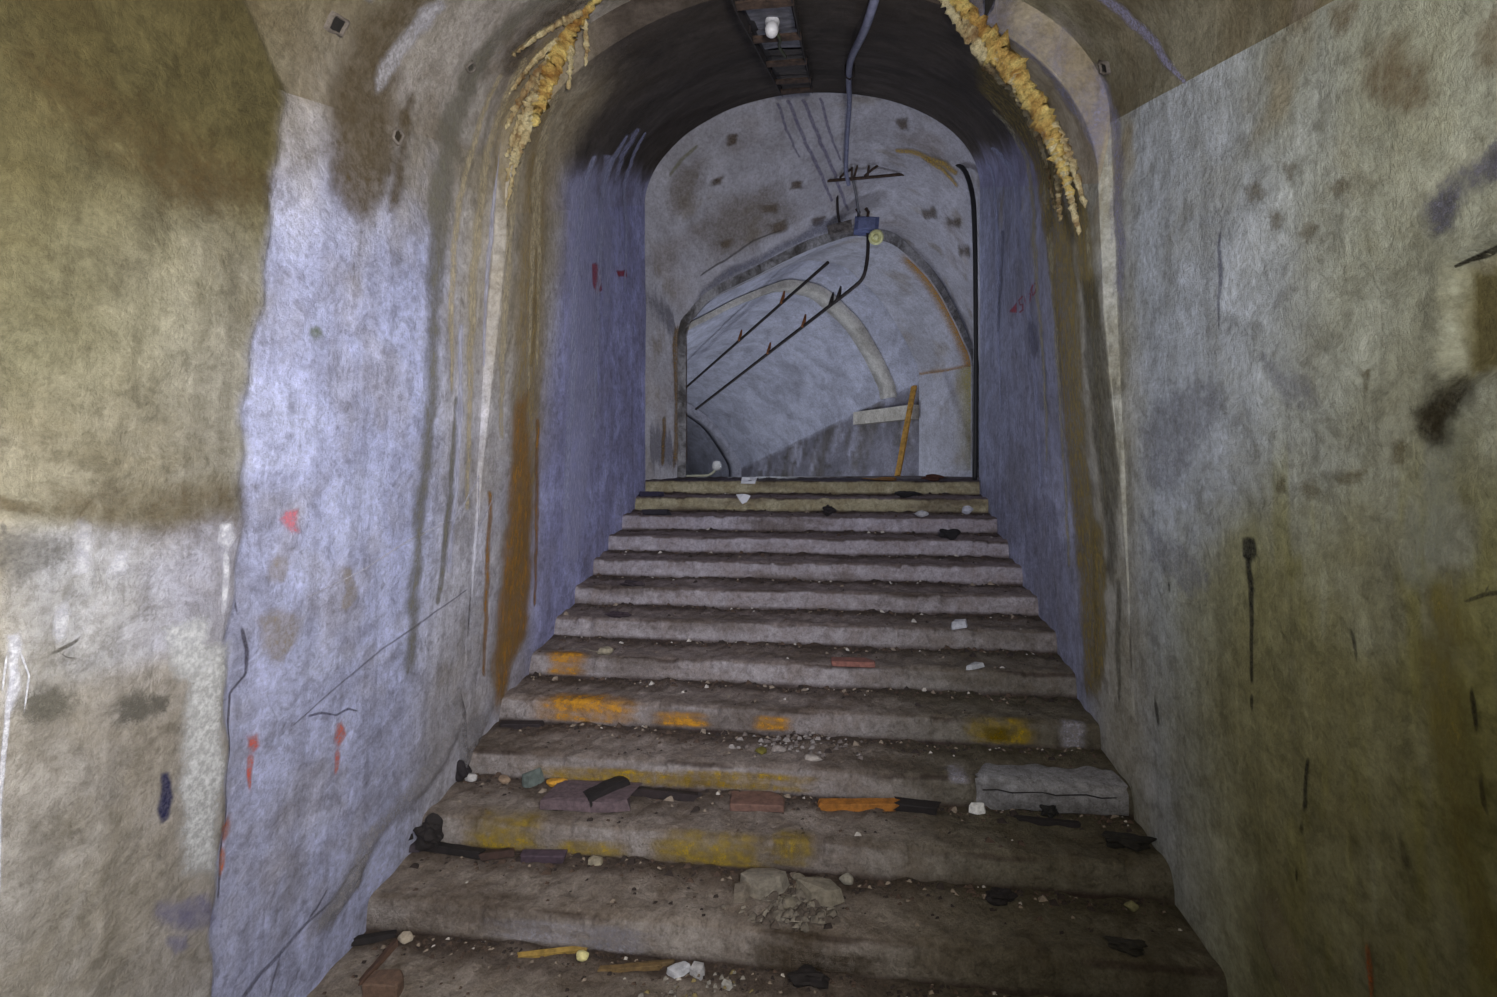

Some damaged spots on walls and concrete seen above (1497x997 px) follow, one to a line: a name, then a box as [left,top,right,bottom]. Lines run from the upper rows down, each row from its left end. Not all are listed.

water stain [1101,0,1185,83]
water stain [407,0,602,673]
water stain [564,129,646,559]
water stain [700,98,848,296]
water stain [939,0,1122,699]
crack [1454,246,1497,268]
corrosion [483,402,539,697]
water stain [0,636,30,867]